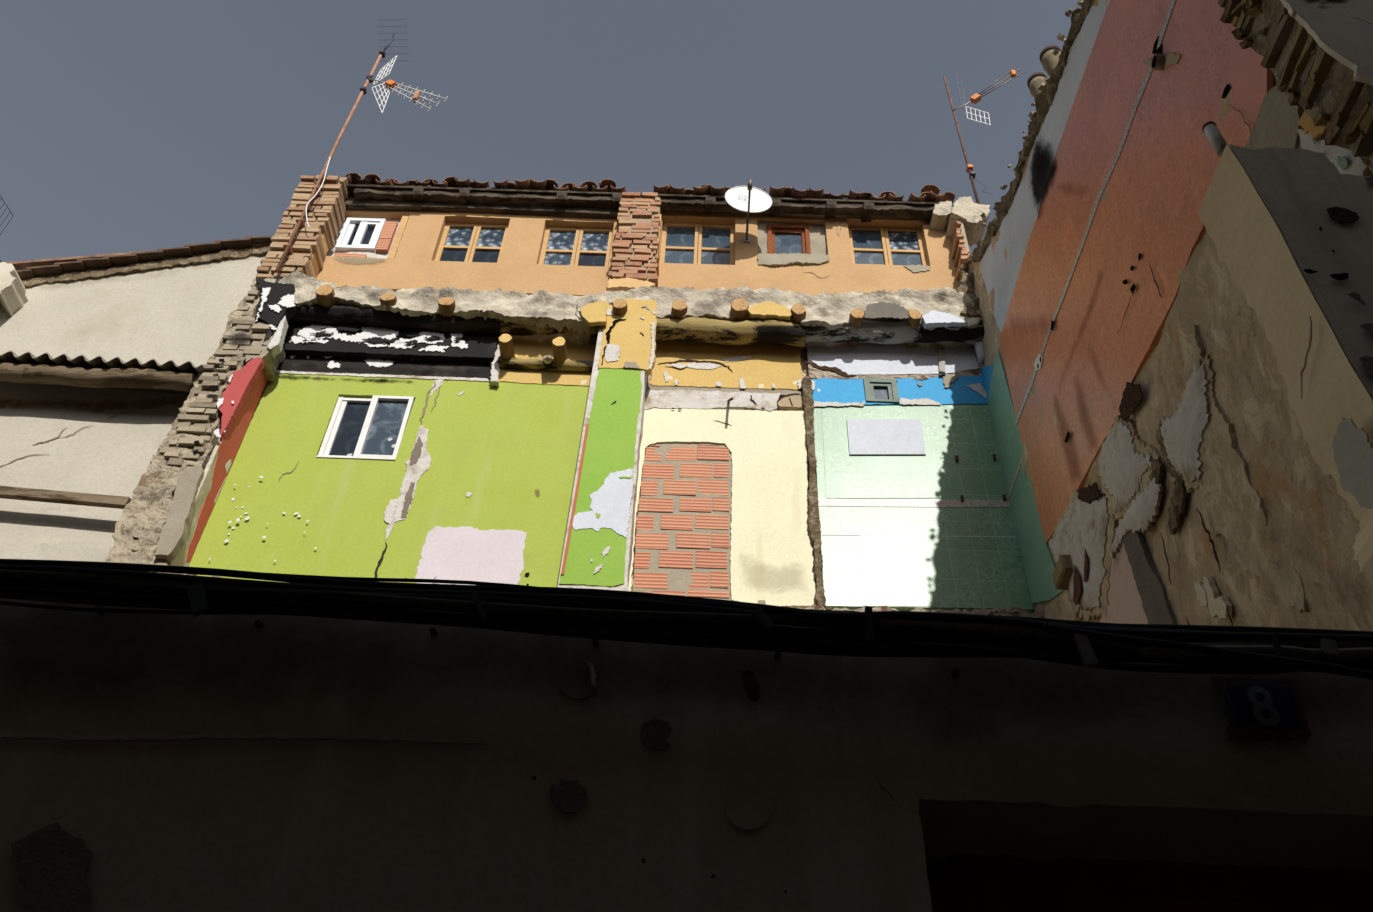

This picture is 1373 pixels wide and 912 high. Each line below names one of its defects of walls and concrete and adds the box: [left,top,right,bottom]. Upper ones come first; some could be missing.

peeling [1297,111,1373,185]
spalling [1319,207,1360,231]
flaking render [864,302,909,319]
spalling [1303,269,1365,305]
peeling [605,317,751,387]
peeling [384,425,432,542]
peeling [572,469,634,574]
peeling [1049,359,1212,618]
peeling [1331,418,1373,509]
flaking render [1194,576,1232,619]